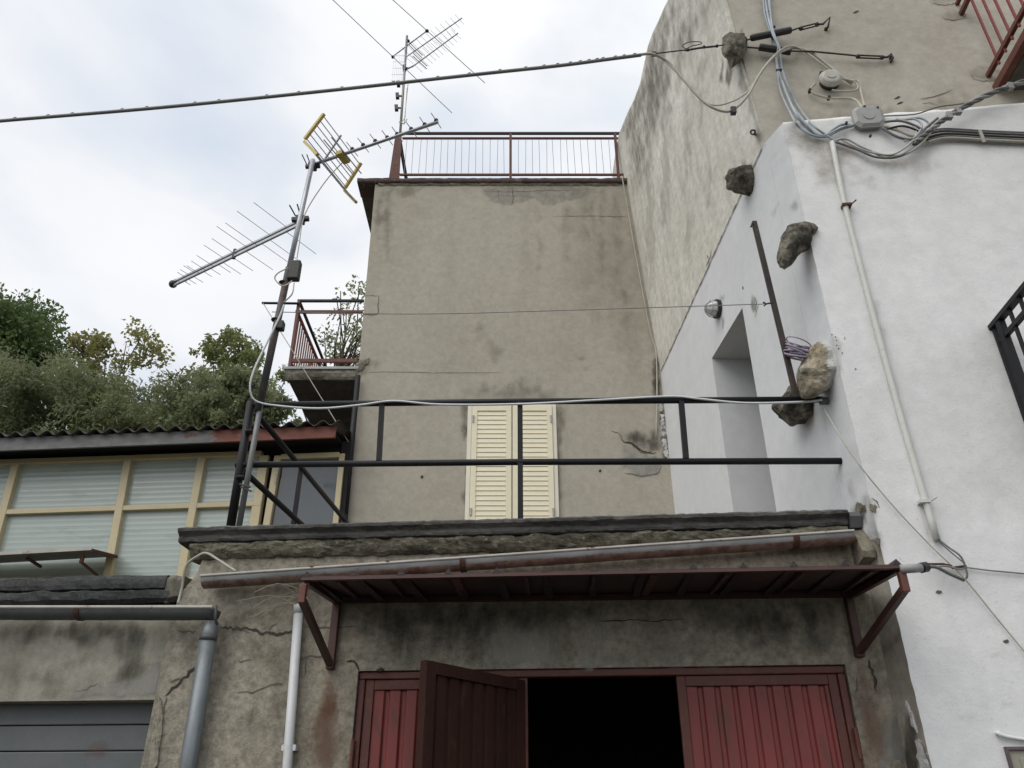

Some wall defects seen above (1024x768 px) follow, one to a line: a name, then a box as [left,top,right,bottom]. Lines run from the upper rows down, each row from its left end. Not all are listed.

crack [612,431,661,477]
crack [178,623,355,636]
crack [163,667,195,714]
crack [854,660,877,694]